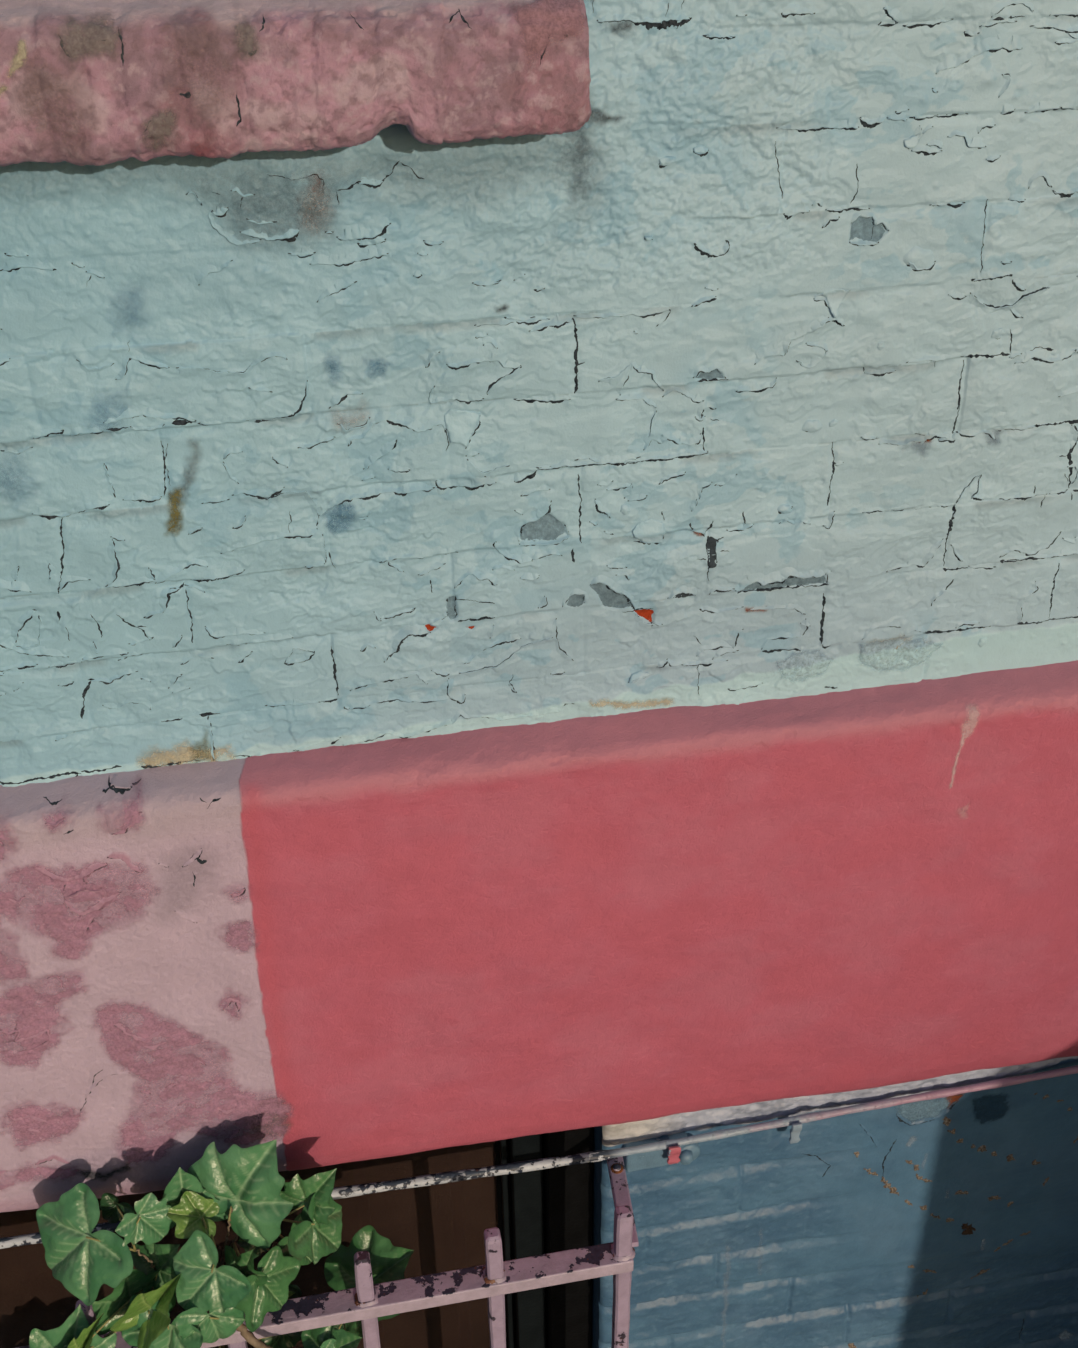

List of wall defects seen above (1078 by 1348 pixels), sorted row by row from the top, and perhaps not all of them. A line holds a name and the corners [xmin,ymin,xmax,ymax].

peeling [776,73,1078,163]
peeling [186,185,391,303]
crack [269,161,424,203]
peeling [783,198,890,246]
peeling [948,258,1049,318]
crack [952,360,964,434]
crack [1059,424,1078,488]
crack [57,611,154,719]
peeling [32,332,663,751]
peeling [667,474,837,694]
crack [819,593,831,649]
crack [886,505,964,606]